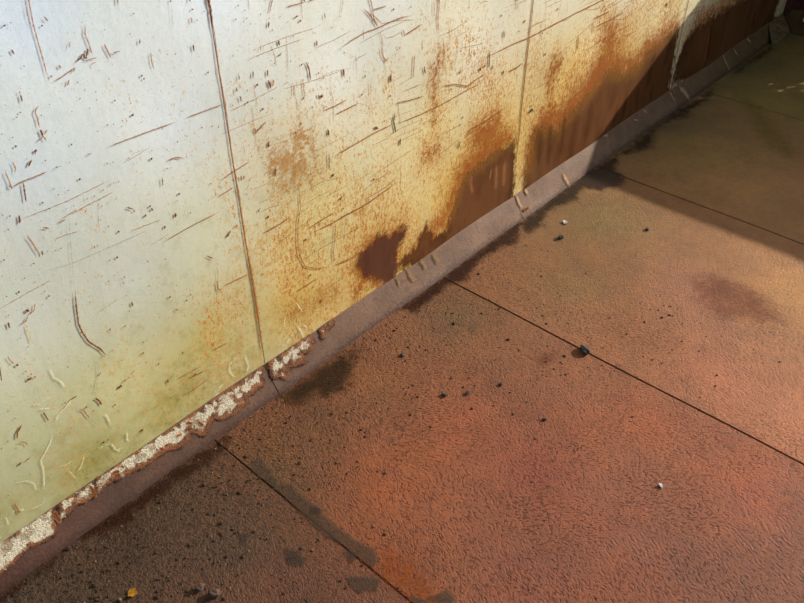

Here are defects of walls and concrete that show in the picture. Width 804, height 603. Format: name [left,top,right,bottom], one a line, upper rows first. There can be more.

corrosion [206,0,269,349]
corrosion [250,112,339,208]
corrosion [280,0,739,322]
water stain [395,0,780,312]
water stain [282,352,357,404]